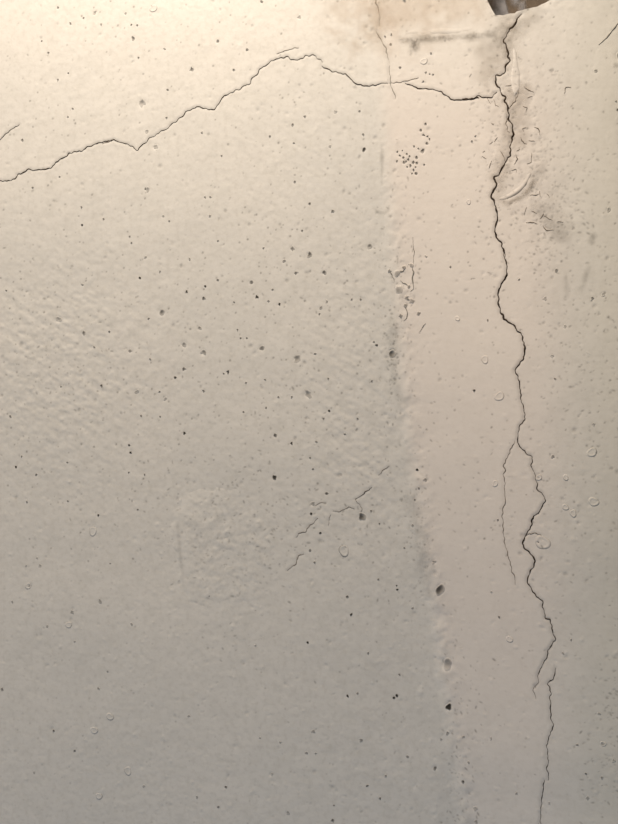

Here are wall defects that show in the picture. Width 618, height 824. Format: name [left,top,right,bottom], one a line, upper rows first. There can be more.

crack [0,47,381,182]
crack [376,14,556,824]
crack [289,467,388,569]